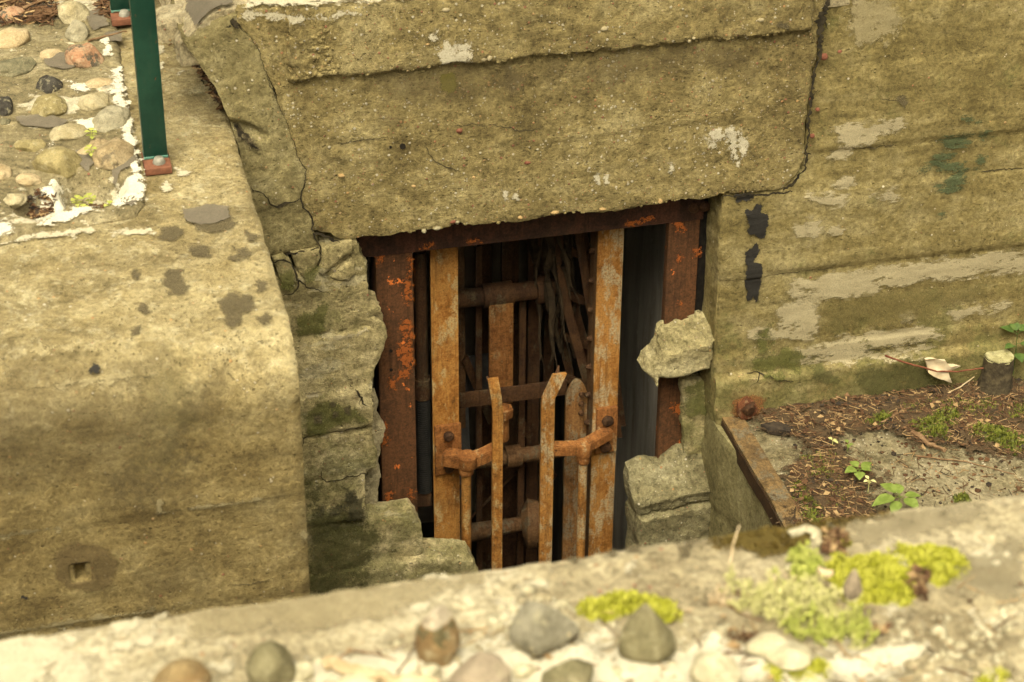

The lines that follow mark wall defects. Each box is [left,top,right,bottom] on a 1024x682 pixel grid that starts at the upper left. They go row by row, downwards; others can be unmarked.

damp [182,204,230,224]
crack [227,18,340,296]
rust [624,215,655,227]
crack [723,0,830,197]
peeling [804,176,858,209]
peeling [825,95,908,160]
rust [387,241,435,390]
peeling [758,247,1024,368]